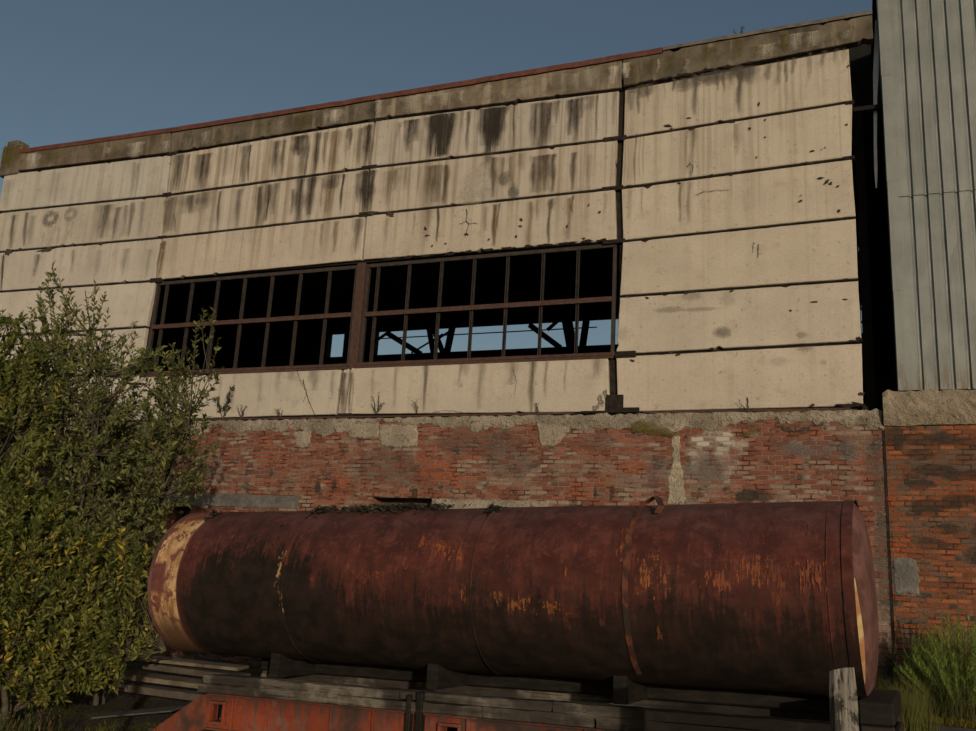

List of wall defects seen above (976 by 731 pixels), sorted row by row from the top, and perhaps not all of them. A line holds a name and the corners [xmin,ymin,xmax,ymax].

water stain [534,102,552,136]
water stain [568,99,579,131]
water stain [3,145,36,167]
water stain [274,133,321,215]
water stain [350,124,372,157]
water stain [407,94,455,198]
water stain [467,107,518,197]
water stain [533,154,556,185]
water stain [257,184,271,217]
water stain [355,170,375,236]